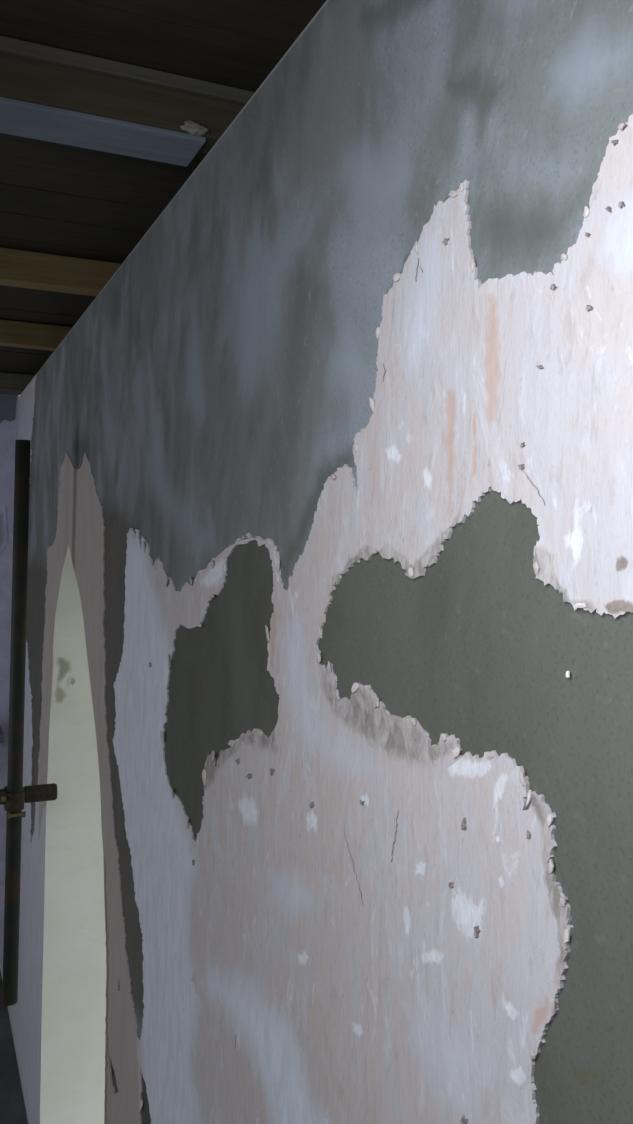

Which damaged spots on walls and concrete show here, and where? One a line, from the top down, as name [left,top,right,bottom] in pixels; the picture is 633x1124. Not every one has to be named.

damp [68,415,93,469]
peeling [18,0,633,594]
damp [96,0,633,1038]
peeling [8,802,46,1124]
peeling [23,641,39,787]
spalling [103,858,120,1124]
peeling [113,488,633,1124]